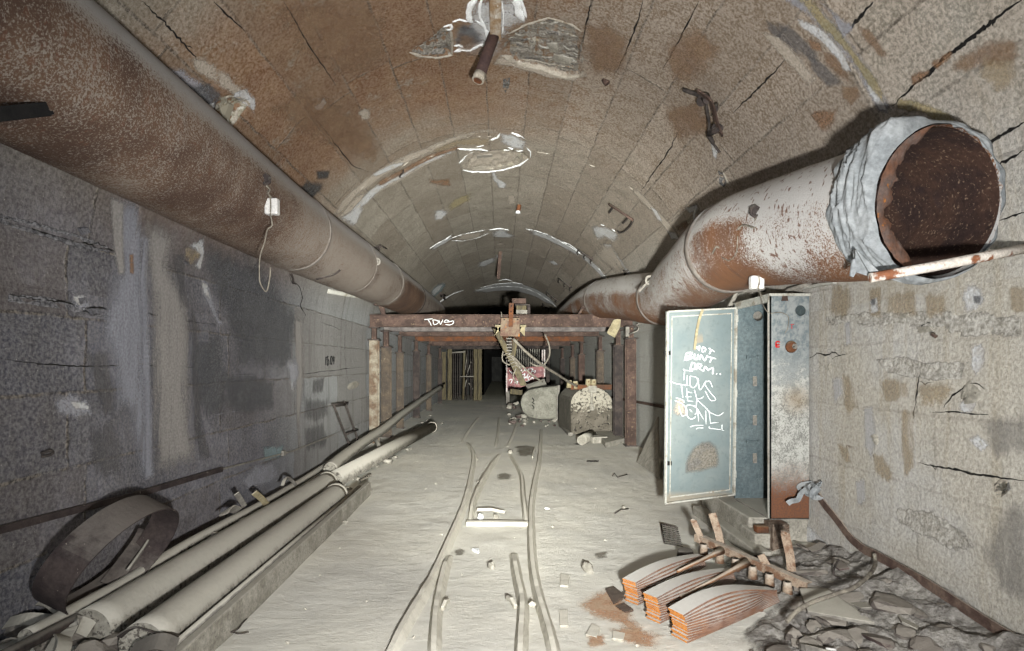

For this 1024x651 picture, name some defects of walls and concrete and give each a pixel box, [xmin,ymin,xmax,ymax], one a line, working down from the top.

crack [142,1,196,57]
spalling [409,27,454,59]
spalling [502,17,584,80]
crack [892,0,1022,106]
crack [733,61,784,113]
spalling [458,148,531,173]
crack [641,134,677,191]
crack [9,294,108,313]
leakage [86,199,326,479]
crack [913,378,989,419]
crack [922,463,1024,481]